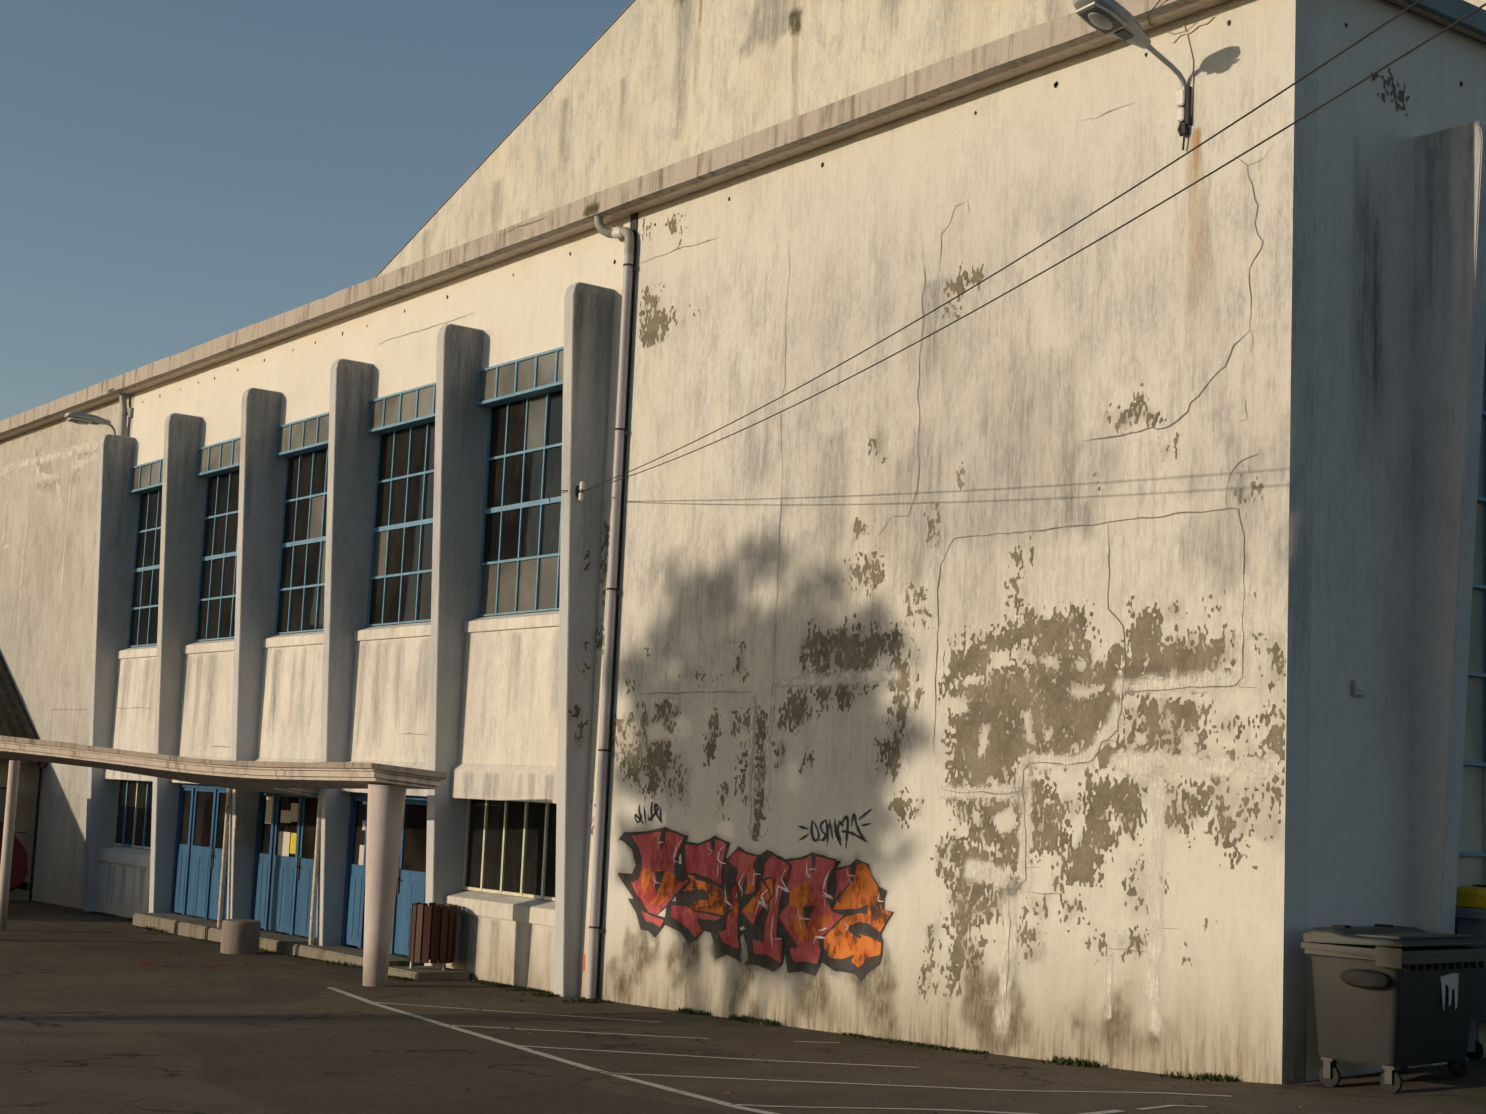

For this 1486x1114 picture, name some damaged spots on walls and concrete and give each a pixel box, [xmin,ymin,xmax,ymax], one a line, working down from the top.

water stain [742,0,800,50]
peeling [634,284,699,348]
peeling [942,264,985,319]
crack [1087,147,1271,441]
peeling [1106,383,1179,462]
peeling [611,511,1286,1005]
crack [933,454,1258,998]
water stain [966,964,1018,1047]